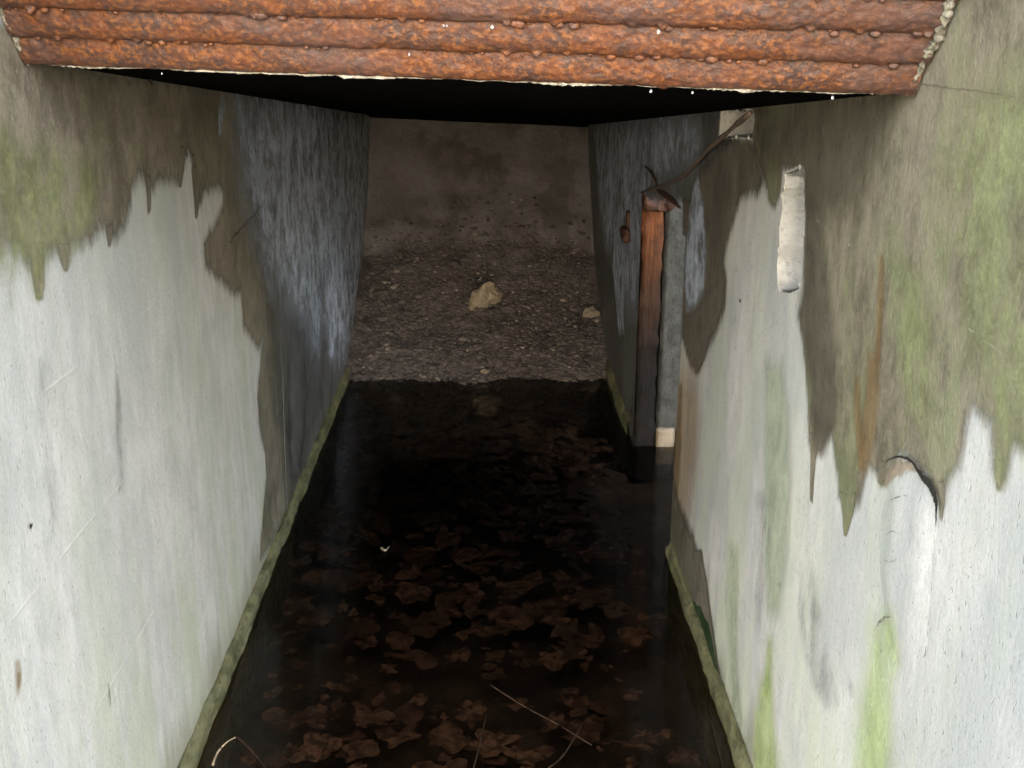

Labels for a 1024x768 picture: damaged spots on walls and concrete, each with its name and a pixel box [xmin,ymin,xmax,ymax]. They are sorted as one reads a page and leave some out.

damp [170,69,440,80]
damp [461,79,621,87]
damp [0,25,371,560]
damp [588,0,1024,536]
crack [882,455,938,527]